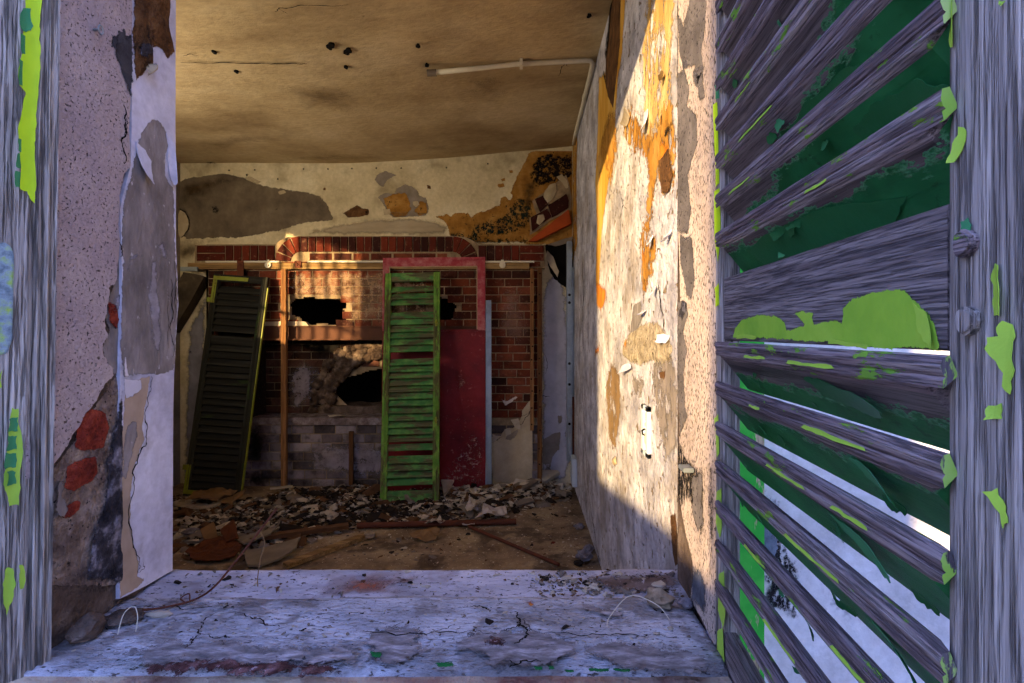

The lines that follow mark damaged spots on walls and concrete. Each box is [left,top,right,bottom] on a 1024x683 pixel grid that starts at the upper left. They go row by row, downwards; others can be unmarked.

spalling [112,0,175,97]
flaking render [375,139,578,287]
flaking render [597,0,721,463]
flaking render [52,119,369,598]
crack [366,605,677,667]